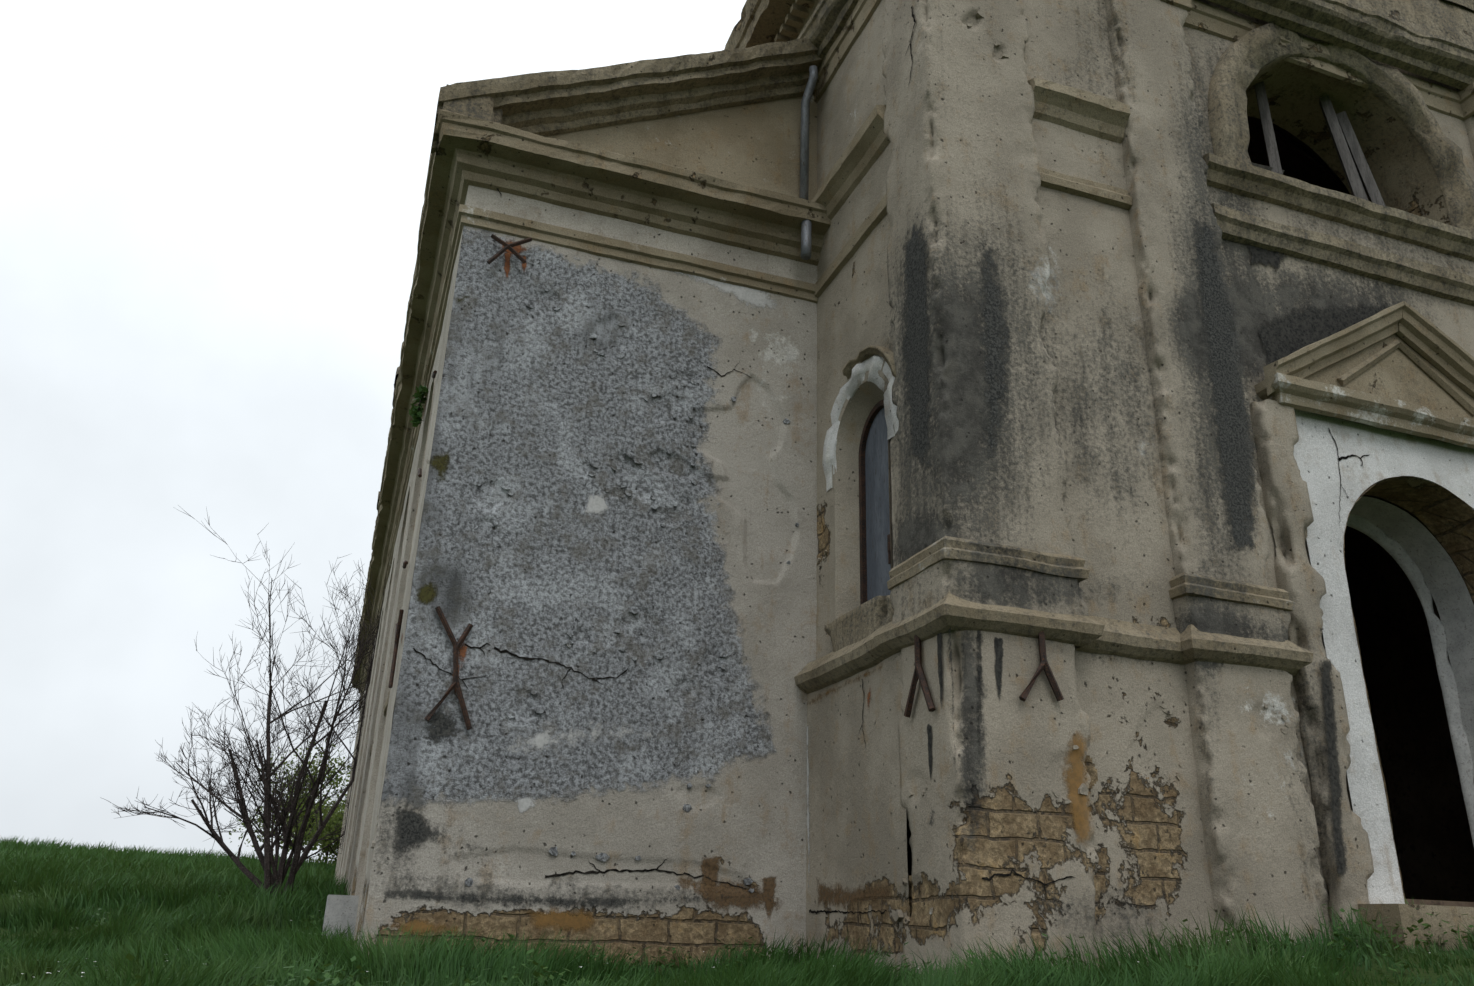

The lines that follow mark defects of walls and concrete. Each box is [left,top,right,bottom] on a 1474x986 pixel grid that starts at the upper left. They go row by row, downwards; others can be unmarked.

crack [905,7,916,87]
rust [502,241,527,277]
damp [902,222,934,470]
damp [973,245,1012,462]
crack [413,643,627,691]
crack [545,859,757,893]
spalling [893,876,933,924]